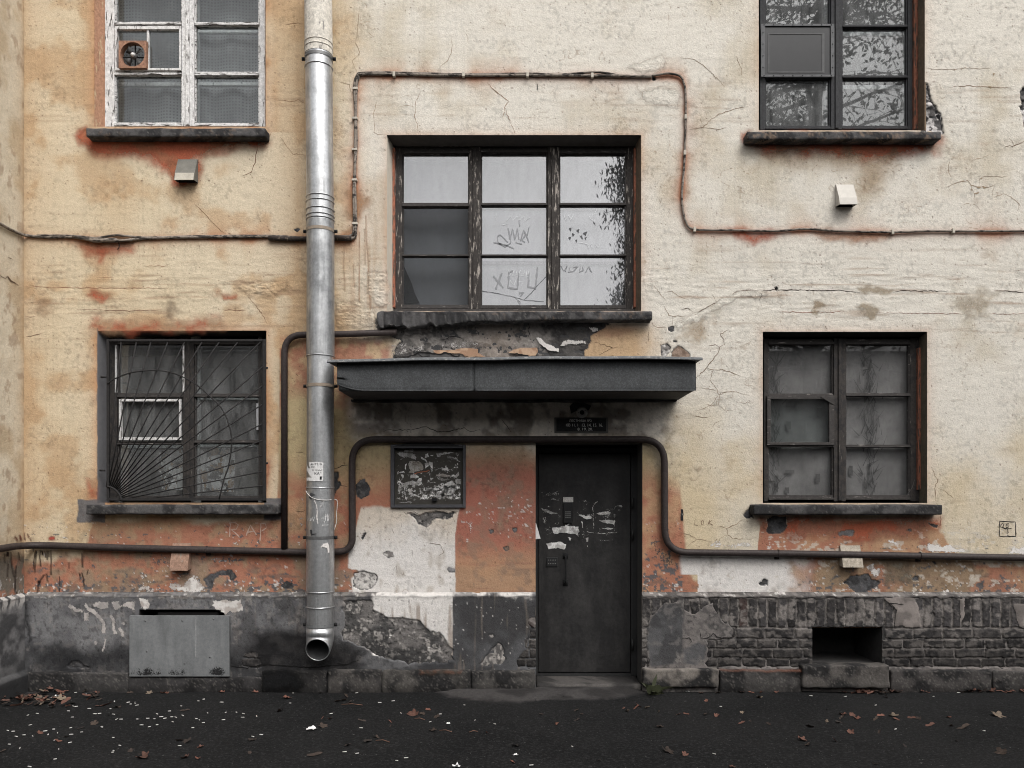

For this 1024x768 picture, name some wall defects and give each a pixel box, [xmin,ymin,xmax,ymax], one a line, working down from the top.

flaking render [923,85,942,134]
corrosion [76,128,262,186]
crack [946,138,1024,209]
flaking render [375,319,603,358]
crack [648,286,859,340]
crack [880,290,957,315]
crack [696,329,747,429]
flaking render [411,512,454,527]
peeling [927,543,965,553]
peeling [139,558,245,593]
flaking render [342,571,453,665]
flaking render [642,563,1024,669]